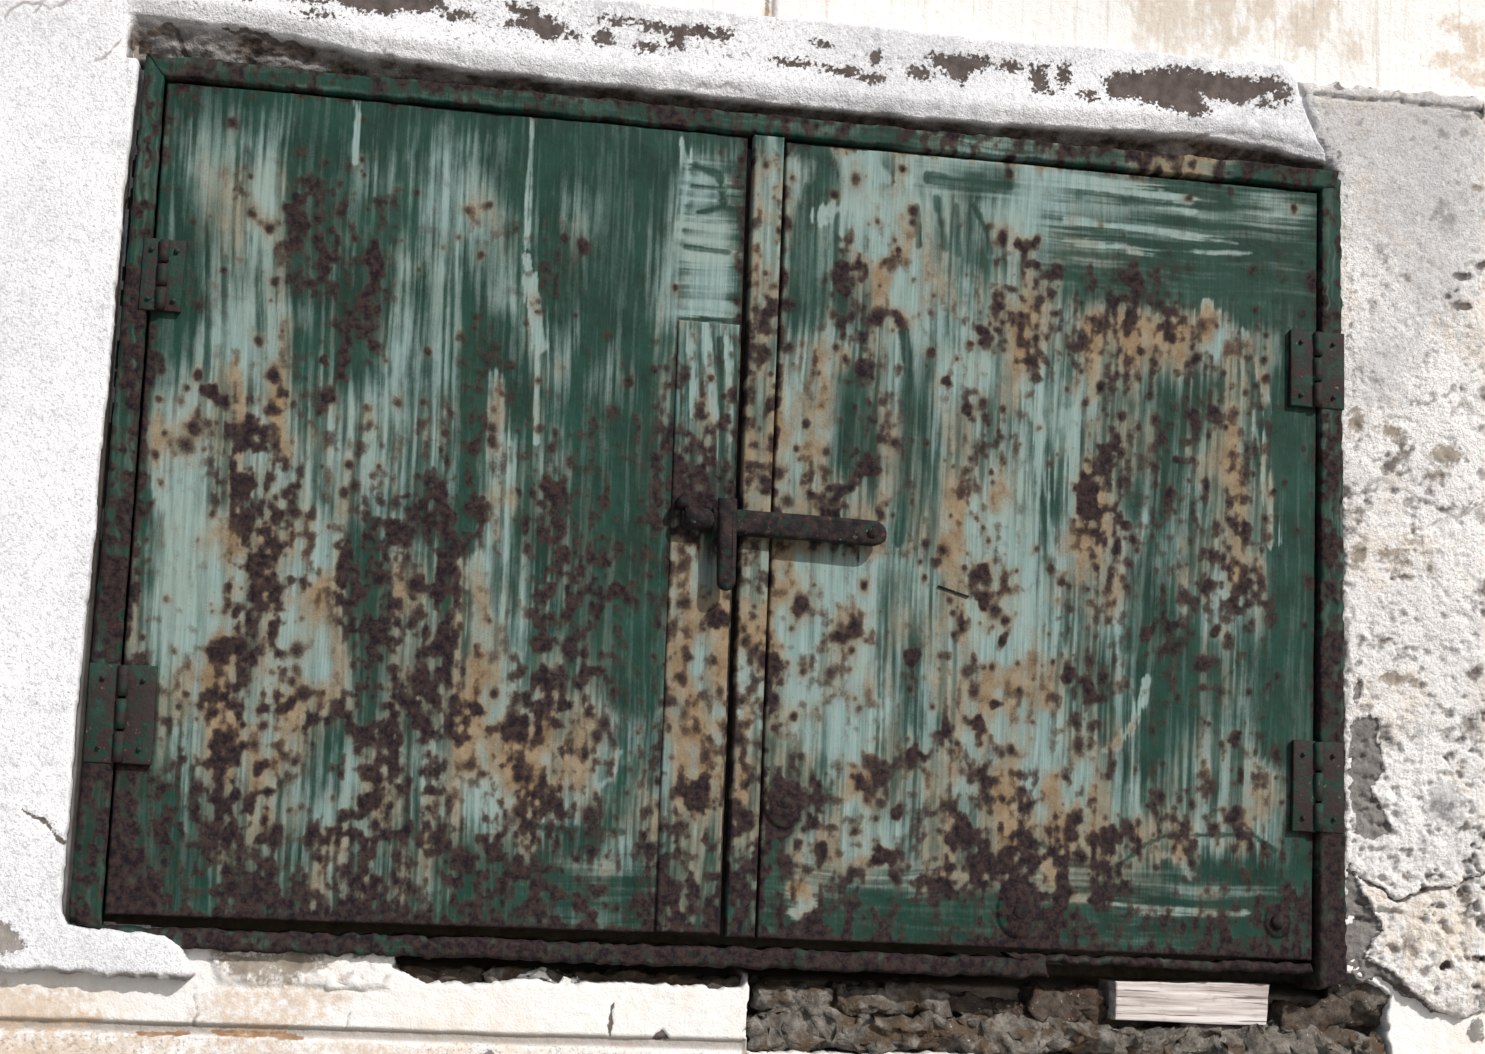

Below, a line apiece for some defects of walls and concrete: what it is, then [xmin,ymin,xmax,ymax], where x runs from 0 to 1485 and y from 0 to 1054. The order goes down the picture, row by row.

peeling [288,0,478,24]
peeling [503,0,741,55]
peeling [768,37,1294,120]
flaking render [1347,679,1393,840]
crack [1358,871,1485,903]
peeling [0,920,28,956]
spalling [400,863,1405,1054]